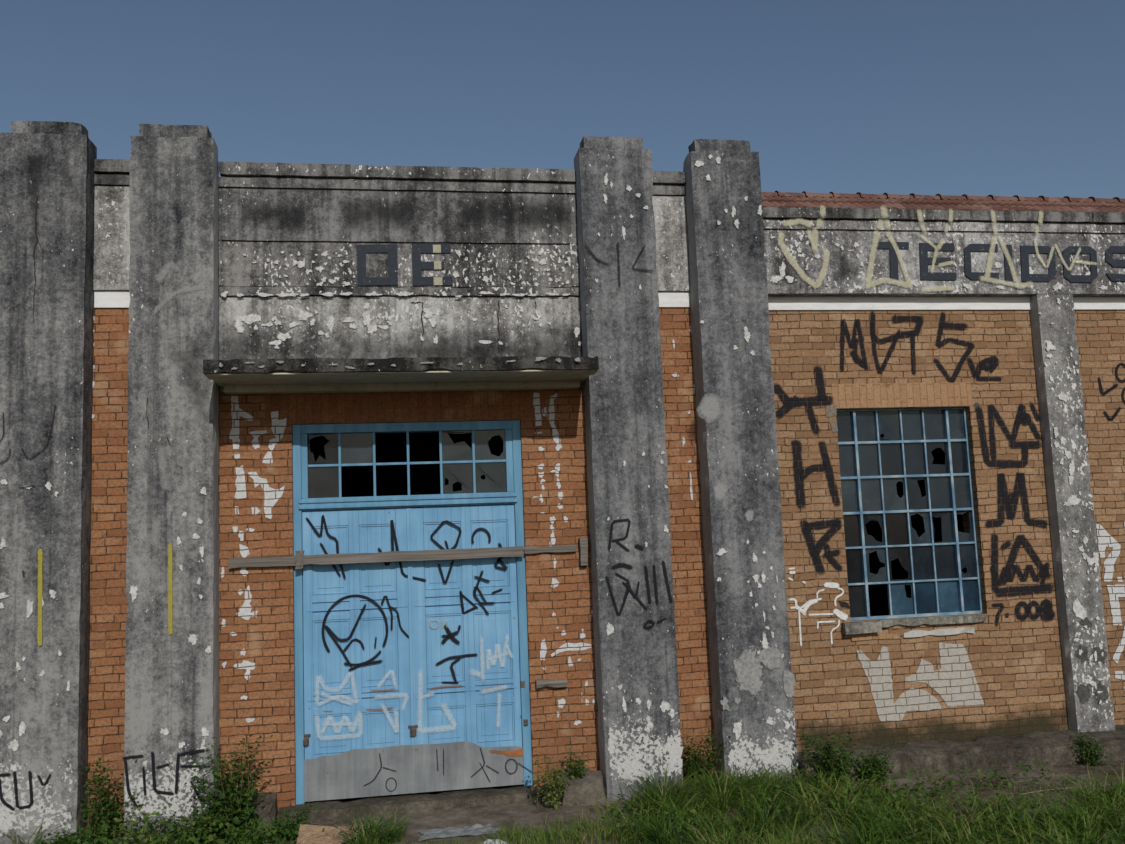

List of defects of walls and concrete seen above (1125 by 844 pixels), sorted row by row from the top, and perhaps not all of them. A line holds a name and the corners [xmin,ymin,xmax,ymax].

water stain [348,203,411,224]
water stain [466,203,565,224]
peeling [219,251,393,370]
peeling [453,249,570,317]
peeling [221,396,287,636]
peeling [532,393,568,545]
peeling [222,649,255,680]
peeling [540,612,592,670]
peeling [720,539,798,783]
peeling [0,715,73,838]
peeling [124,727,211,825]
peeling [608,684,684,786]